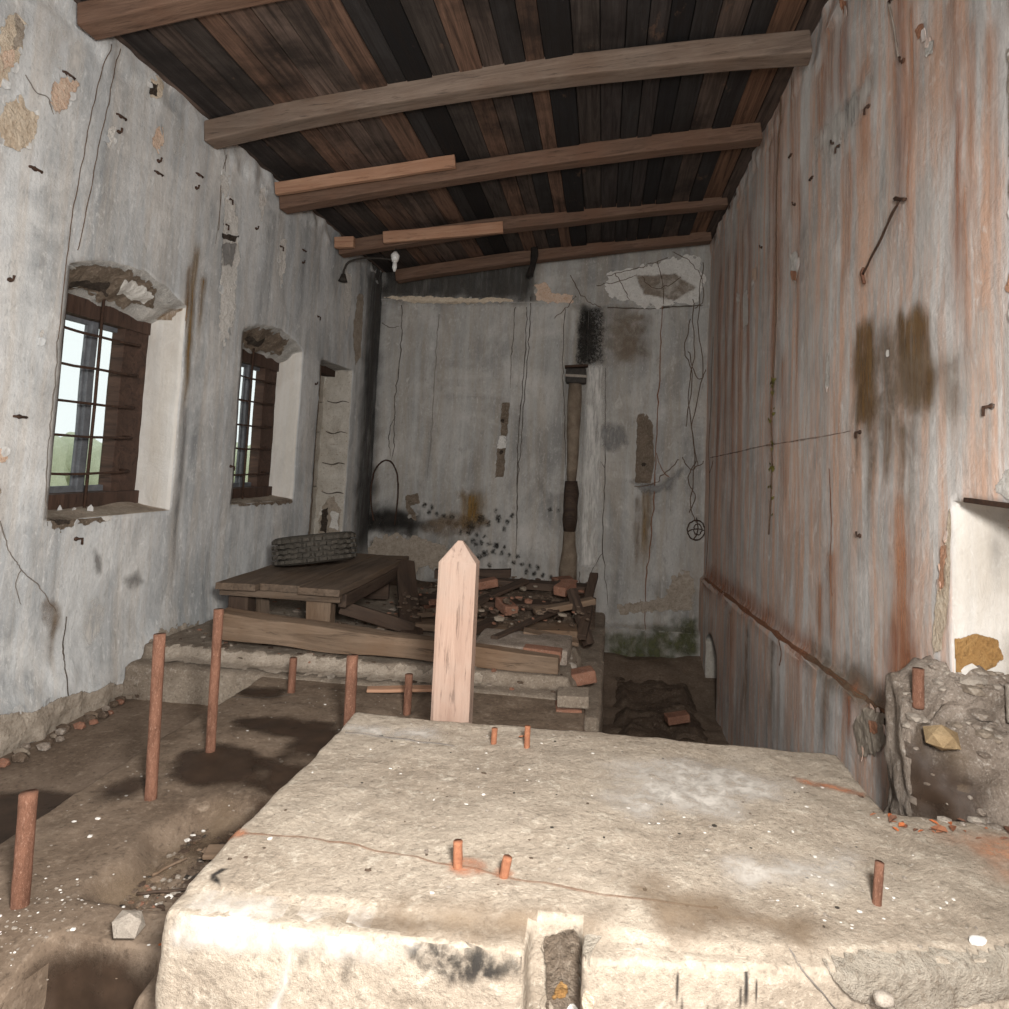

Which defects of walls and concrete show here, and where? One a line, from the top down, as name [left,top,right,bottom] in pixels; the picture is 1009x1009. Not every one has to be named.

spalling [0,13,40,152]
spalling [50,72,80,114]
rust [956,120,972,239]
peeling [605,254,706,309]
leakage [855,306,933,429]
crack [0,521,69,696]
leakage [423,495,552,579]
rust [895,504,911,672]
rust [783,630,885,728]